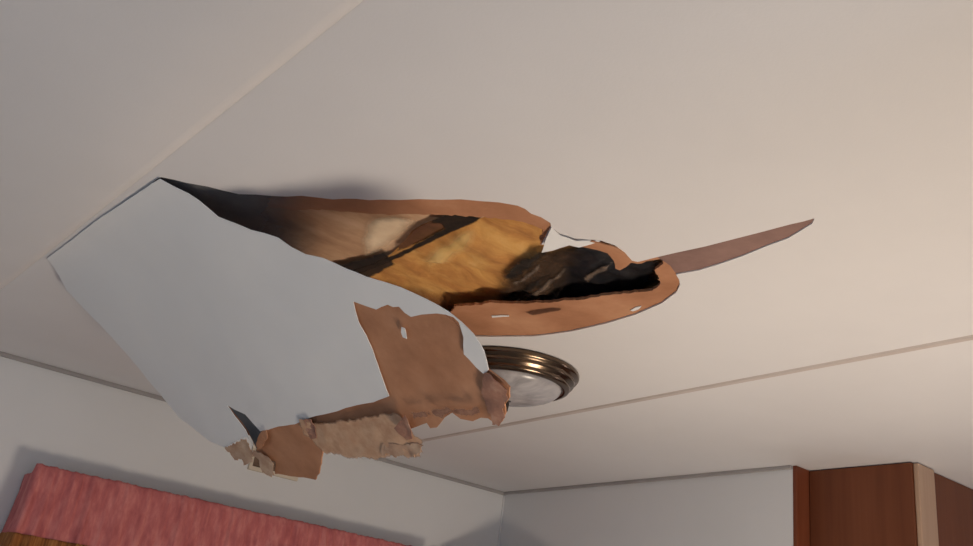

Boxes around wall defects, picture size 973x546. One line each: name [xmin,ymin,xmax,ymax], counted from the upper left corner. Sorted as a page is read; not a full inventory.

damp [154,177,298,249]
damp [366,218,408,251]
peeling [542,227,632,270]
peeling [658,219,813,273]
damp [501,247,659,315]